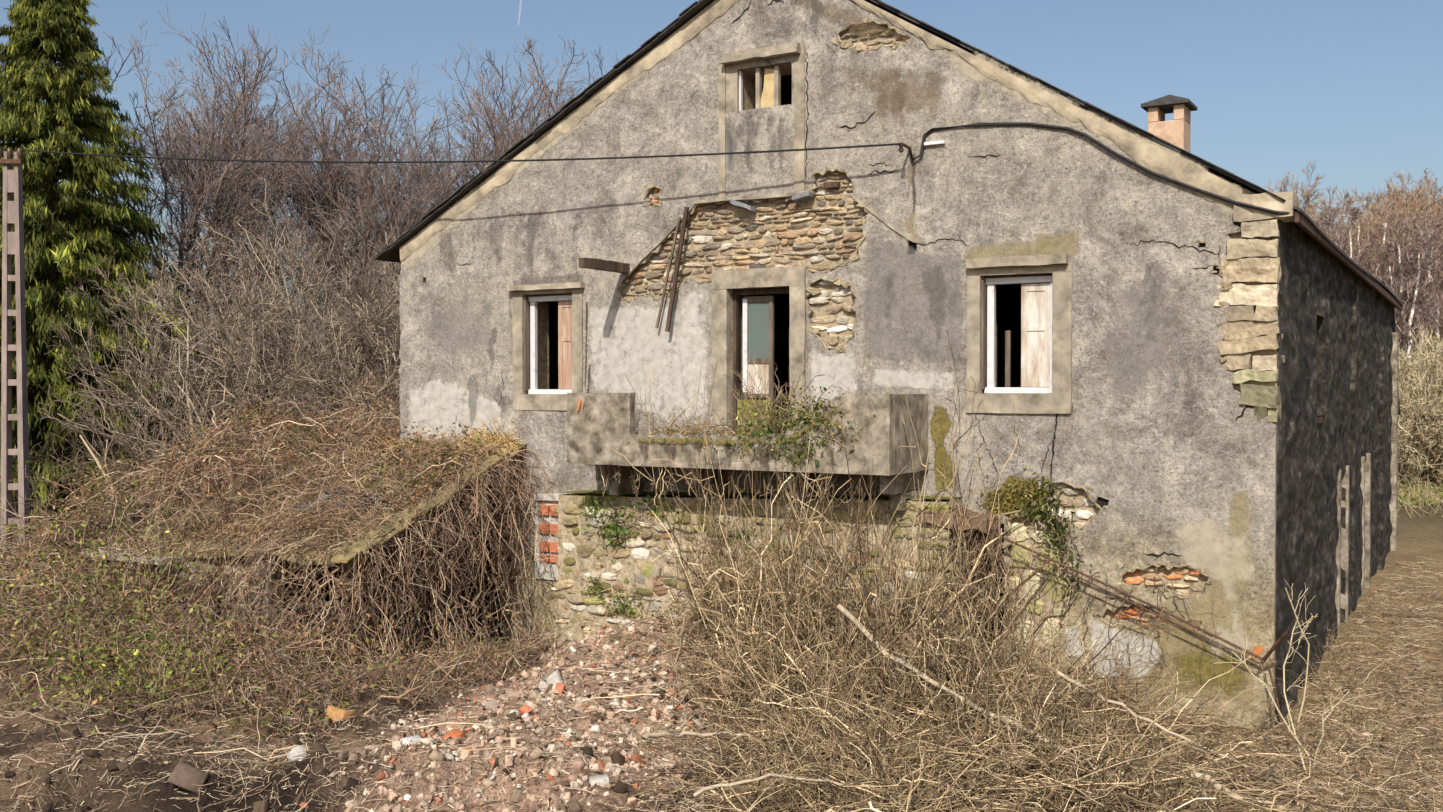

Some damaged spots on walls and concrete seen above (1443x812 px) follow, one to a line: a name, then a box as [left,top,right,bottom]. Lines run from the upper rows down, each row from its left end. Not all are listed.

flaking render [831,18,910,52]
peeling [590,167,954,423]
peeling [1000,482,1254,678]
damp [1140,493,1252,701]